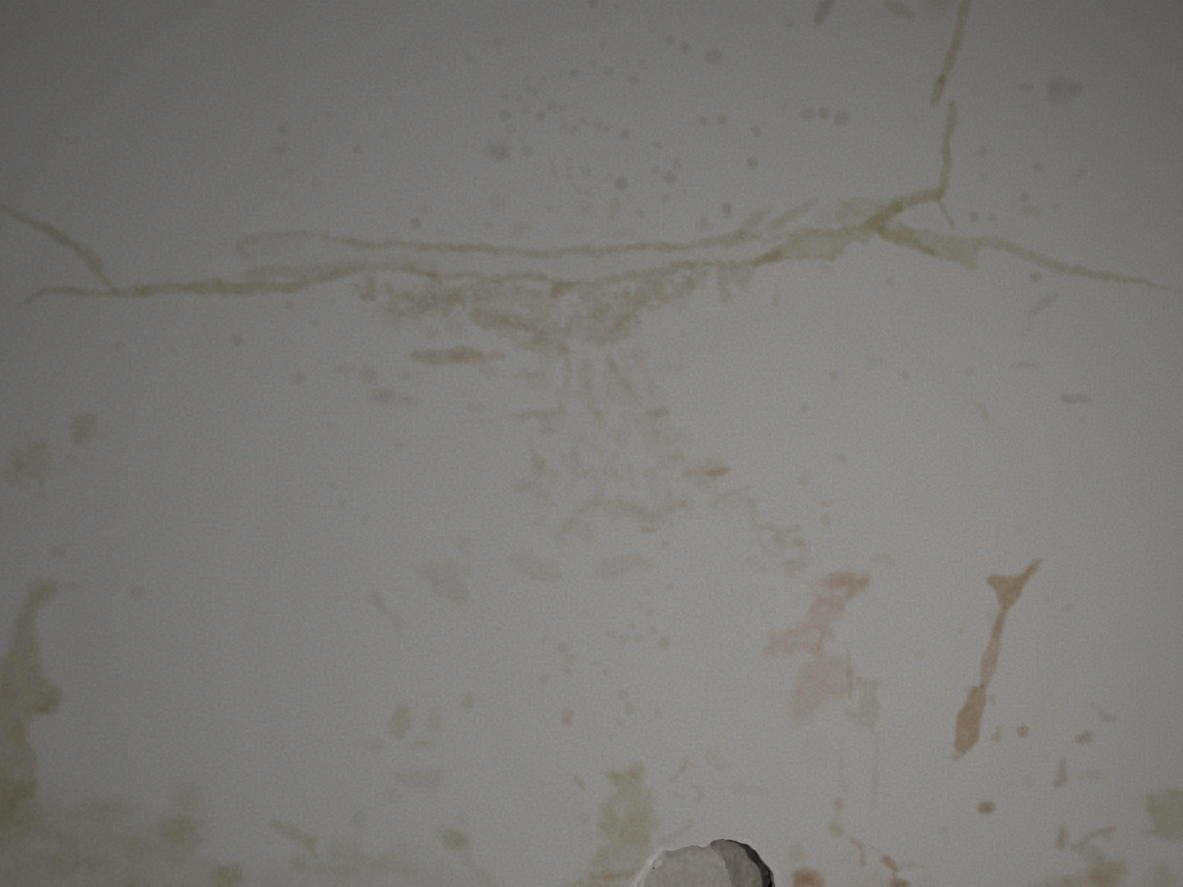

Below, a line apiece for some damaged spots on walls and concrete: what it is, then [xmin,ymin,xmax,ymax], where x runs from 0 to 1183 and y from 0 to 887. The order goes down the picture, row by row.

flaking render [637,837,777,887]